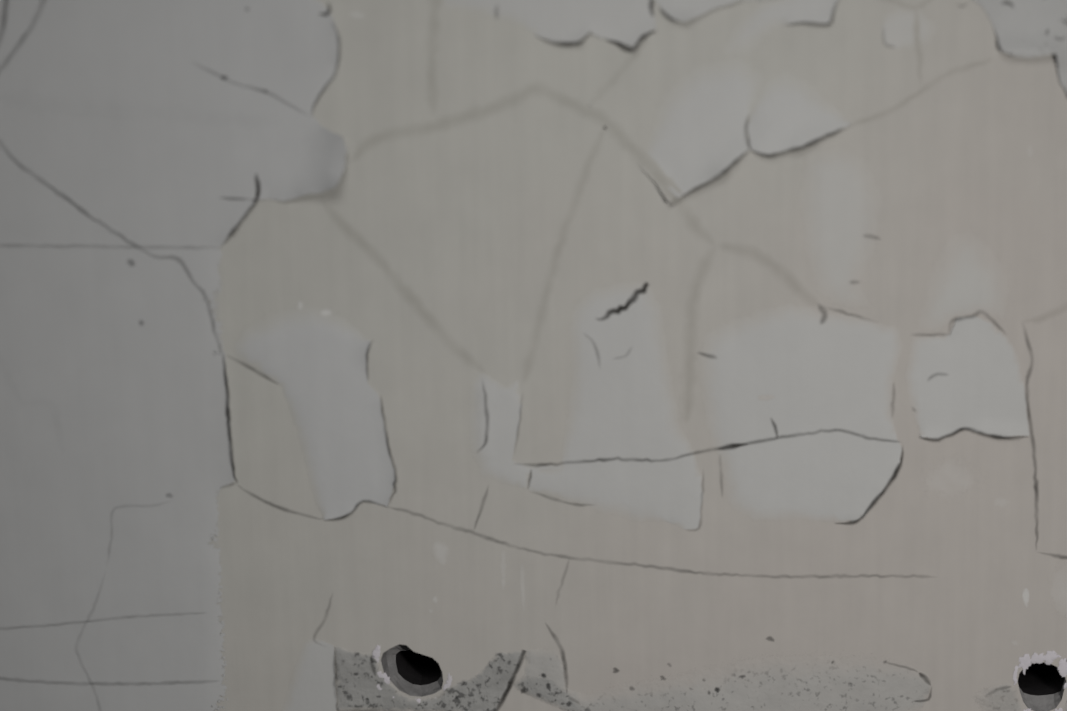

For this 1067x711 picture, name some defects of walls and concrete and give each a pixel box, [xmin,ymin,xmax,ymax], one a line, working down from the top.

peeling [441,0,738,52]
peeling [647,0,851,198]
peeling [974,0,1067,93]
peeling [0,0,347,711]
crack [224,371,237,481]
peeling [529,281,703,529]
peeling [699,226,1030,524]
spalling [281,637,931,711]
spalling [972,651,1067,711]